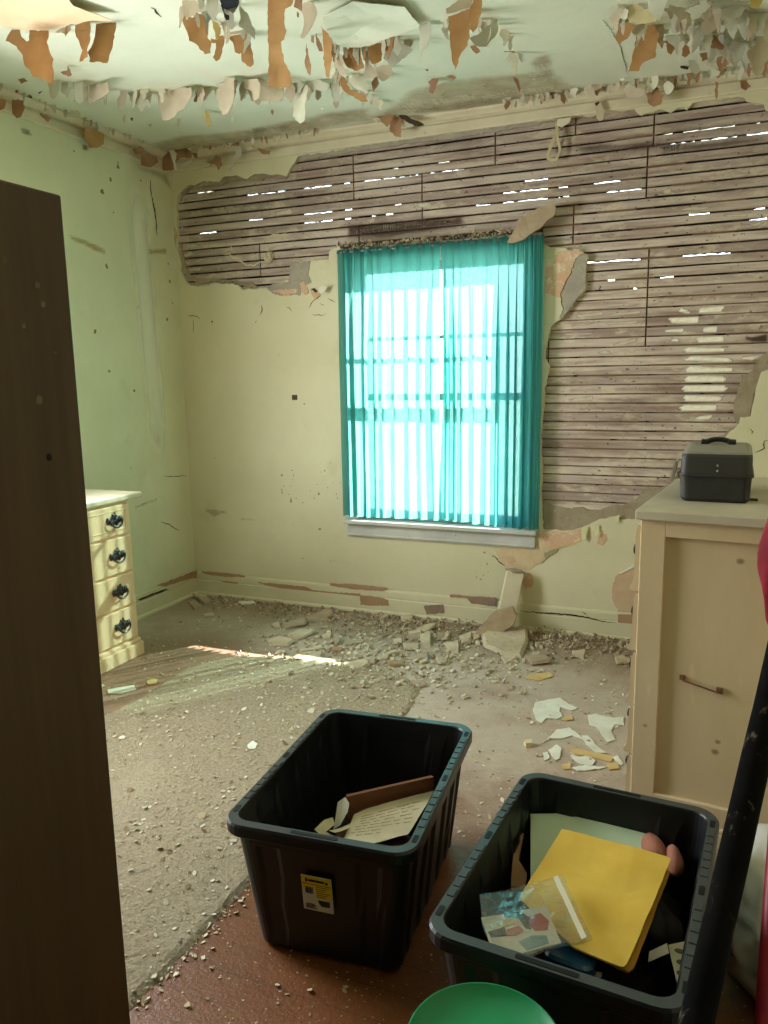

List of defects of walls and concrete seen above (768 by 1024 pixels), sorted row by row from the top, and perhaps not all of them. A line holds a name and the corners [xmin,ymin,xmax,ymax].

crack [149,180,157,233]
flaking render [0,0,768,589]
peeling [257,582,389,606]
crack [522,611,616,623]
peeling [611,565,637,624]